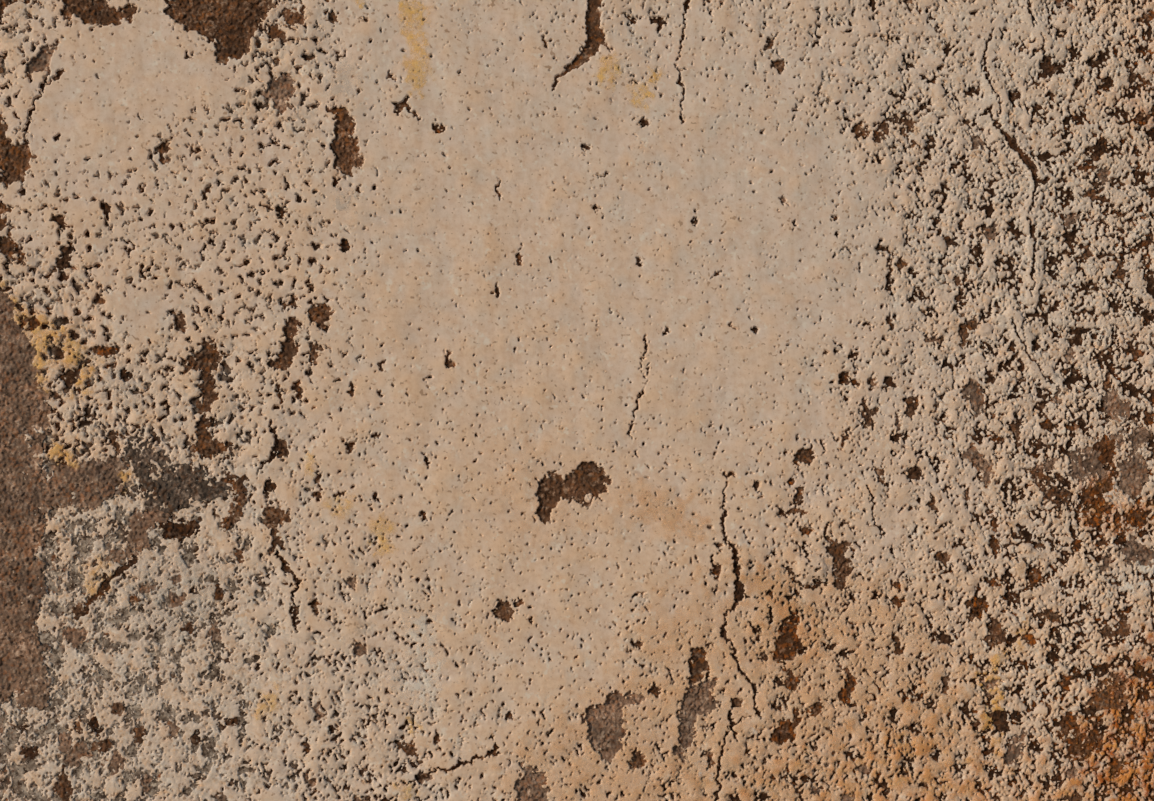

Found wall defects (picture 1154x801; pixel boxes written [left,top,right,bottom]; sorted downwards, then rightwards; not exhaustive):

flaking render [58,0,137,31]
flaking render [163,0,307,117]
crack [552,0,613,91]
crack [1027,0,1045,59]
crack [979,29,1050,297]
crack [1011,319,1057,387]
flaking render [0,291,291,713]
flaking render [535,461,611,525]
crack [710,482,774,801]
flaking render [581,682,661,771]
flaking render [672,642,743,768]
rust [1071,673,1154,801]